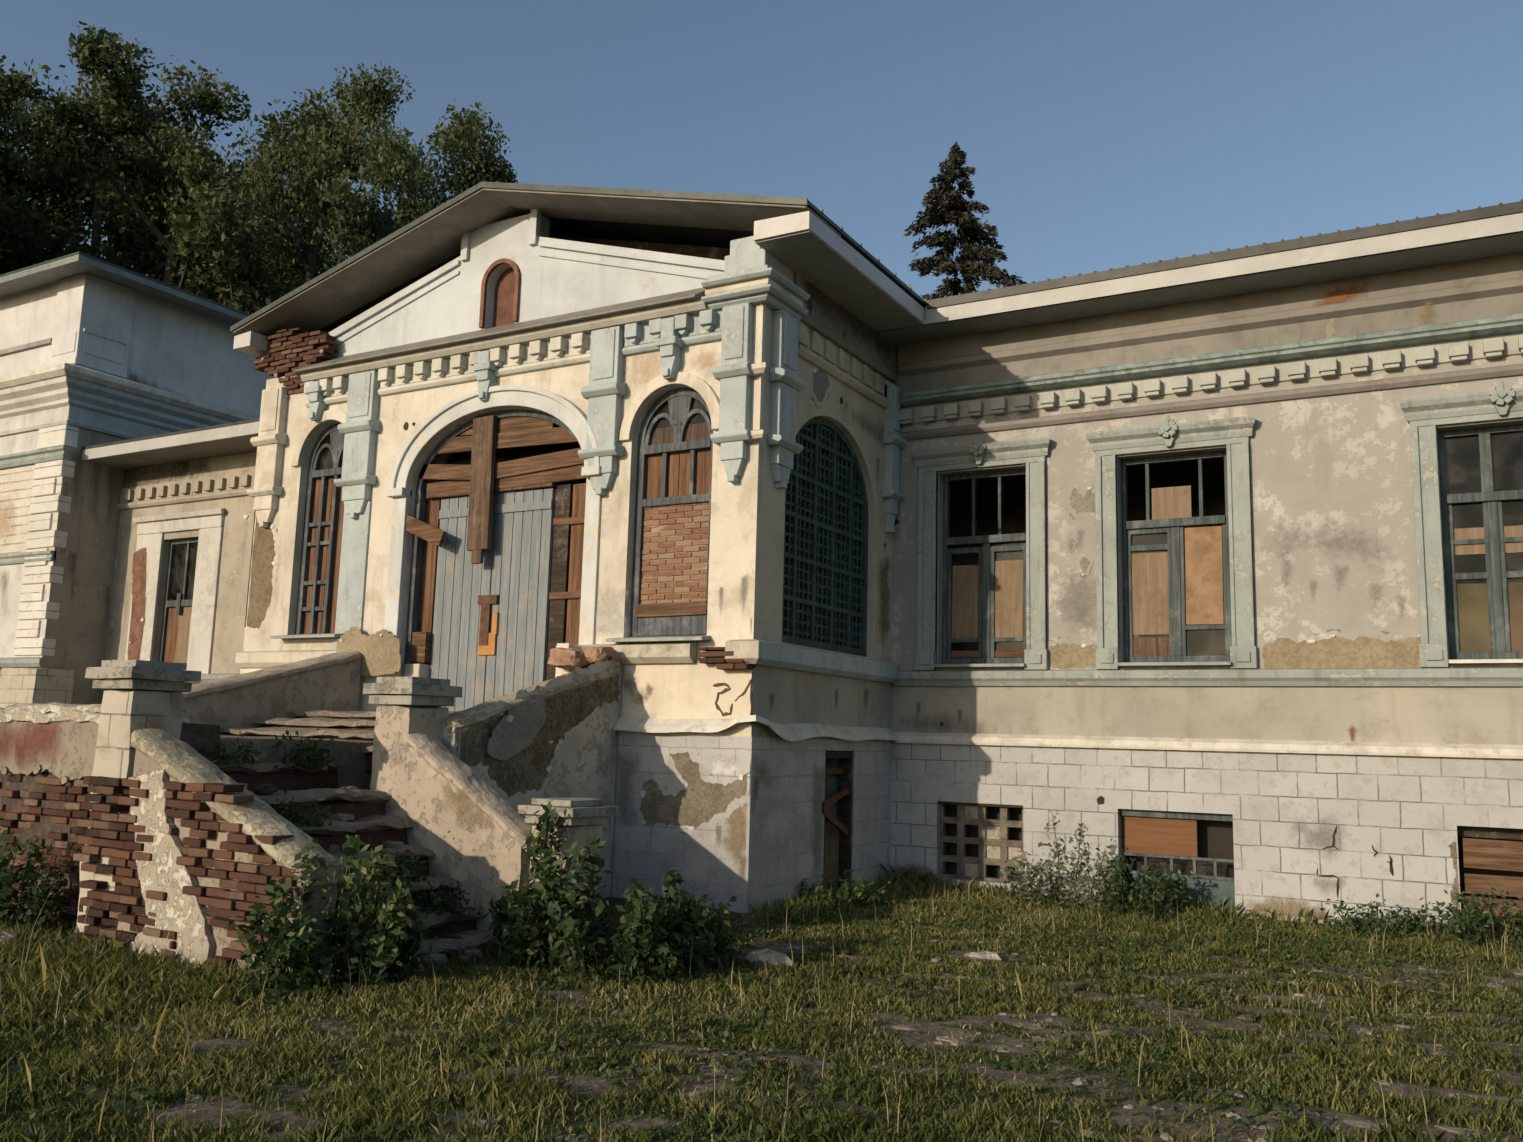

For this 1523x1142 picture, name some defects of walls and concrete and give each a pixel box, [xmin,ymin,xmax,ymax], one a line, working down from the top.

corrosion [1322,287,1358,305]
flaking render [253,328,338,398]
flaking render [243,507,282,638]
water stain [879,559,890,634]
flaking render [1255,624,1421,669]
flaking render [452,660,622,806]
crack [713,672,754,725]
flaking render [0,710,300,970]
flaking render [631,739,751,895]
crack [1316,826,1394,898]